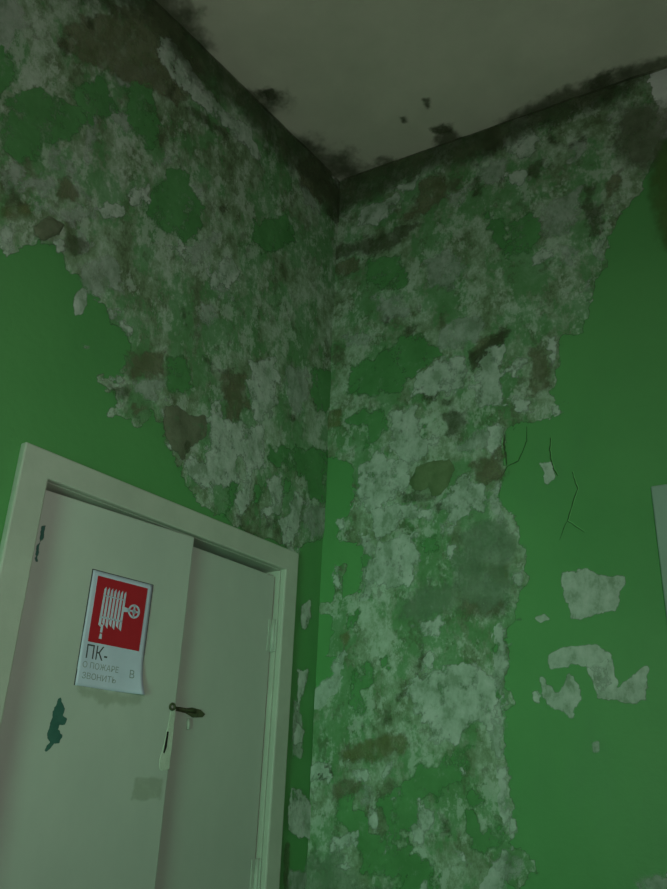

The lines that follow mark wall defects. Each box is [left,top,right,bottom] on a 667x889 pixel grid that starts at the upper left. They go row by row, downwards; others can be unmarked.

water stain [137,0,667,211]
peeling [0,0,339,553]
peeling [284,74,659,889]
crack [499,427,527,493]
crack [549,438,583,538]